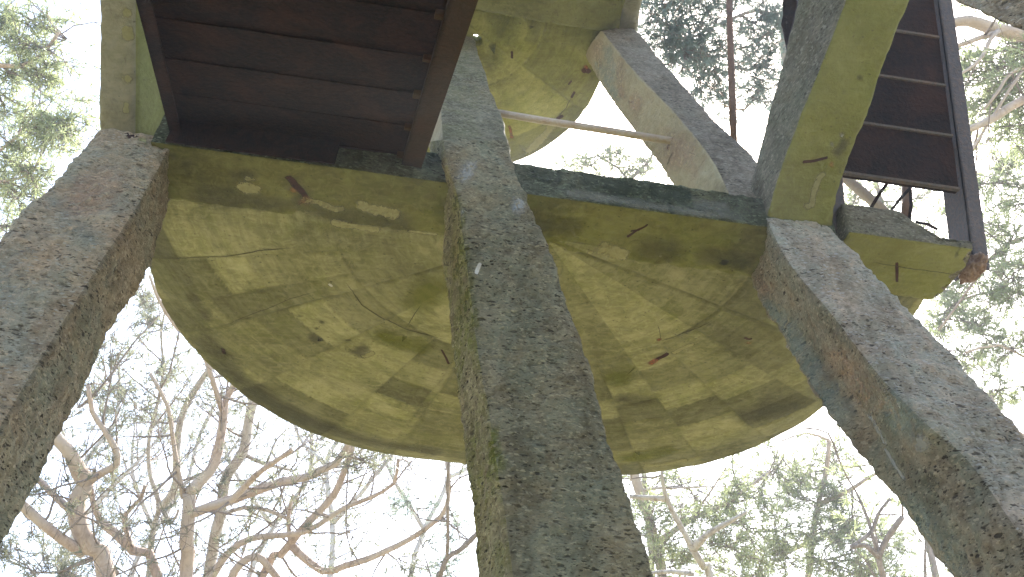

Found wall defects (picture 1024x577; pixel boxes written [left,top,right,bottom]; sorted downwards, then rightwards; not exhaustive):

crack [161,247,295,259]